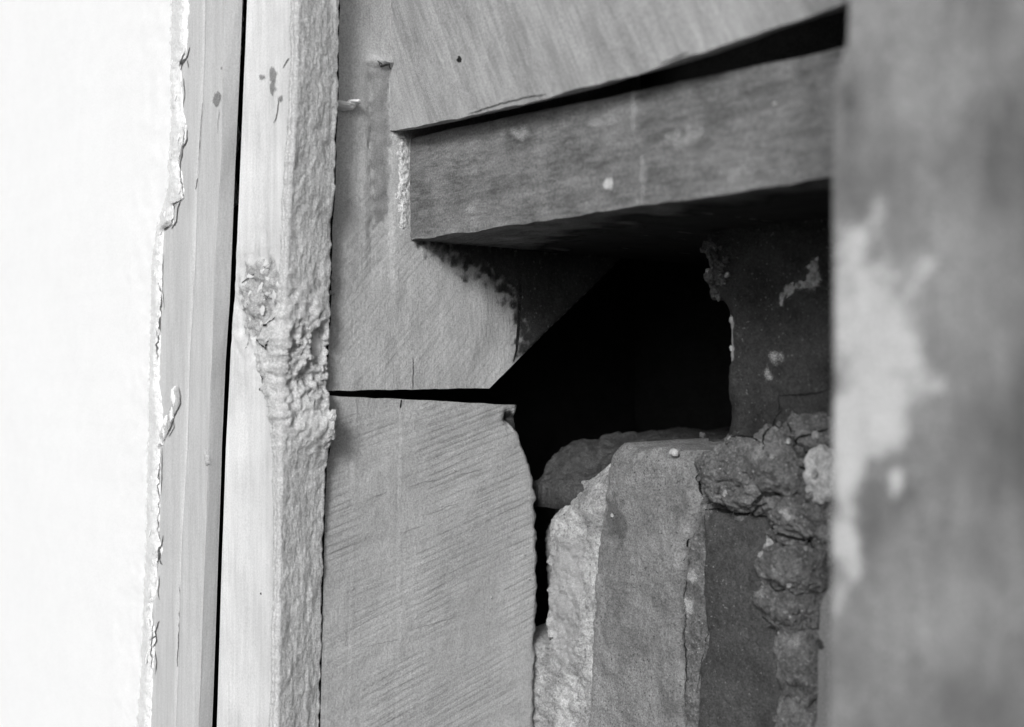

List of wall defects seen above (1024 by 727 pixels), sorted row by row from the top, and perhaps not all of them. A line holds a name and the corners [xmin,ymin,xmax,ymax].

peeling [158,386,180,447]